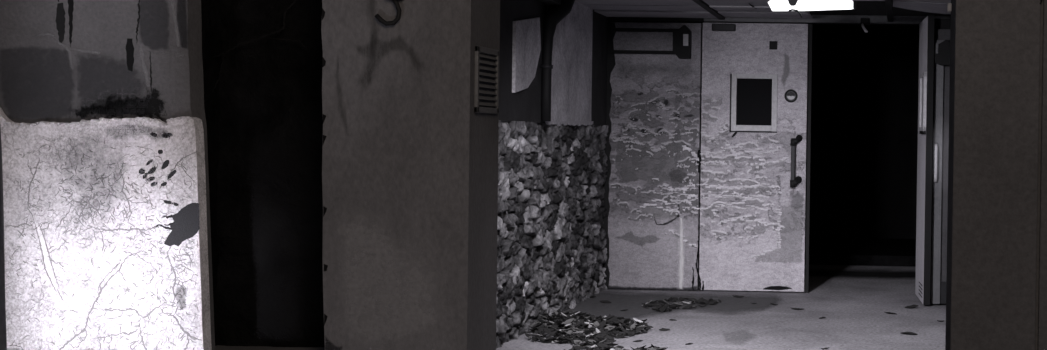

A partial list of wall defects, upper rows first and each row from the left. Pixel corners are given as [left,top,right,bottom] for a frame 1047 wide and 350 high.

crack [56,0,74,47]
crack [7,137,202,350]
peeling [610,88,789,259]